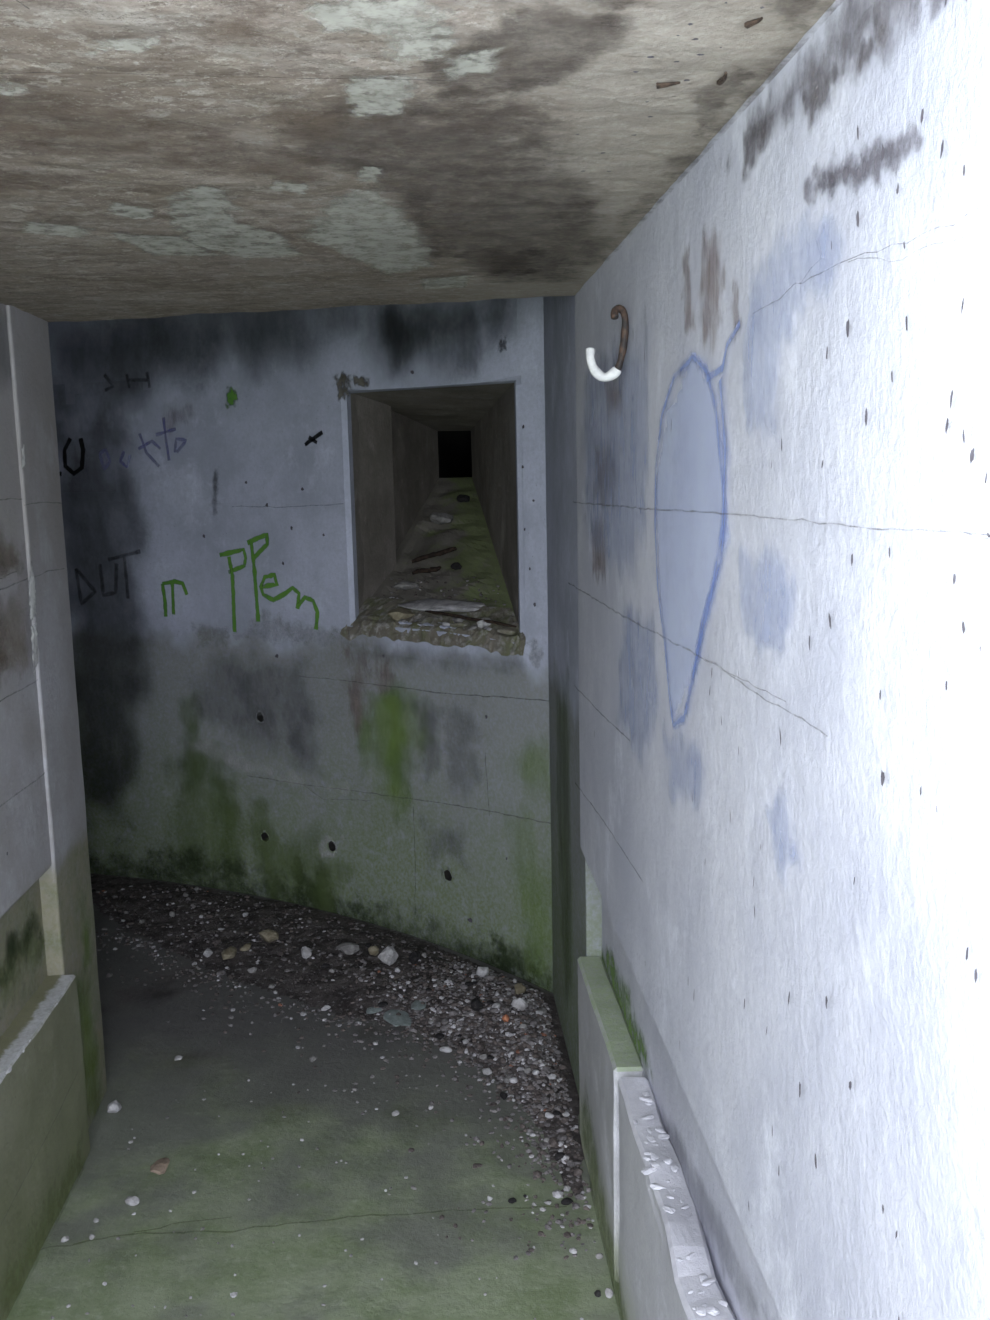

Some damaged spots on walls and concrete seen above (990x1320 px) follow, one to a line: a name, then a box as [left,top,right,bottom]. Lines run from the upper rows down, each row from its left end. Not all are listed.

leakage [743,0,899,175]
leakage [247,0,633,282]
leakage [804,129,920,199]
leakage [71,319,219,396]
leakage [386,315,472,366]
leakage [66,437,140,803]
spalling [340,597,526,656]